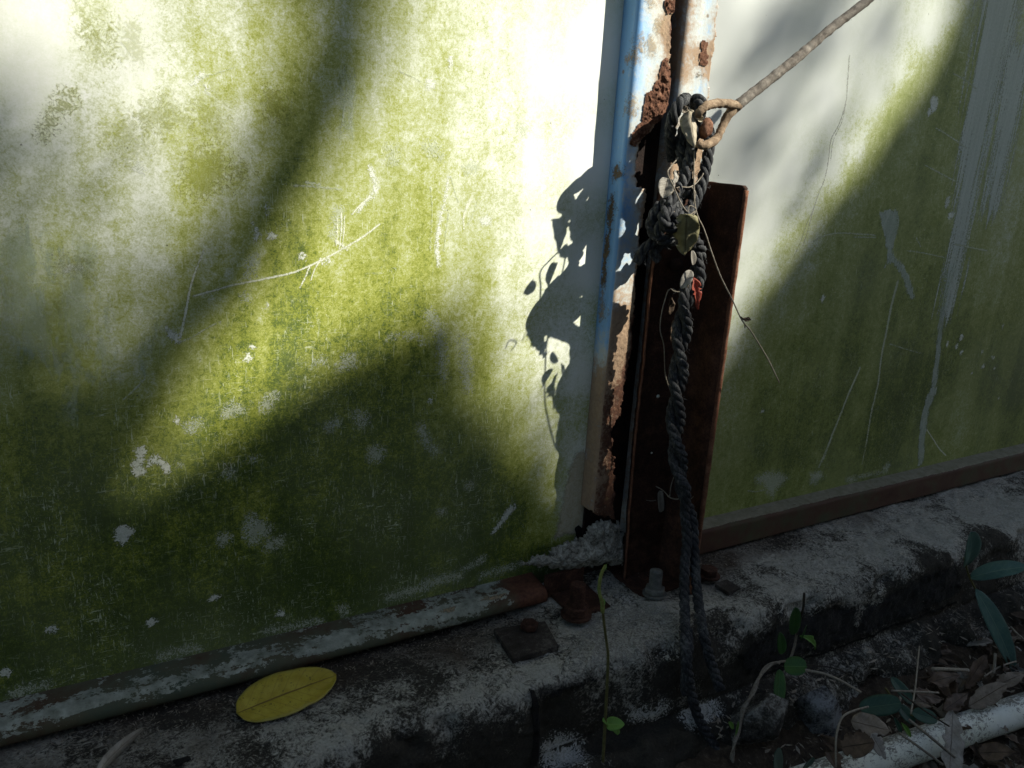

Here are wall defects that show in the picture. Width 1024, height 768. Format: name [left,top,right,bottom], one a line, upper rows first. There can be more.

corrosion [624,0,675,147]
corrosion [698,40,709,77]
corrosion [598,162,626,323]
damp [918,0,1024,466]
damp [862,209,913,461]
damp [554,451,585,539]
damp [552,592,681,680]
damp [737,553,961,675]
peeling [0,668,52,700]
damp [539,728,594,768]
damp [625,696,726,734]